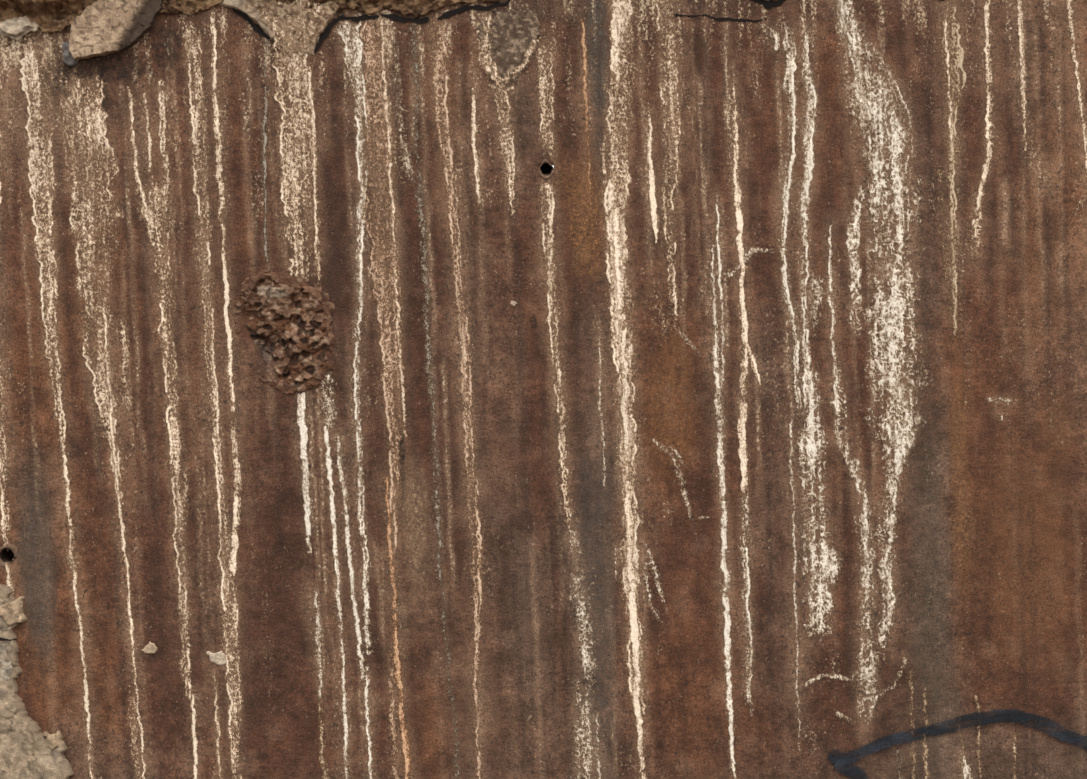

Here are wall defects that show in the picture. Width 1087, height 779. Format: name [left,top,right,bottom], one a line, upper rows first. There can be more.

spalling [0,16,39,41]
peeling [62,0,163,67]
damp [261,31,323,286]
damp [470,12,494,205]
damp [488,85,518,221]
damp [935,0,995,336]
damp [1016,0,1049,188]
efflorescence [1066,0,1087,177]
damp [18,12,247,779]
damp [295,13,487,779]
damp [530,0,933,779]
spalling [0,584,73,779]